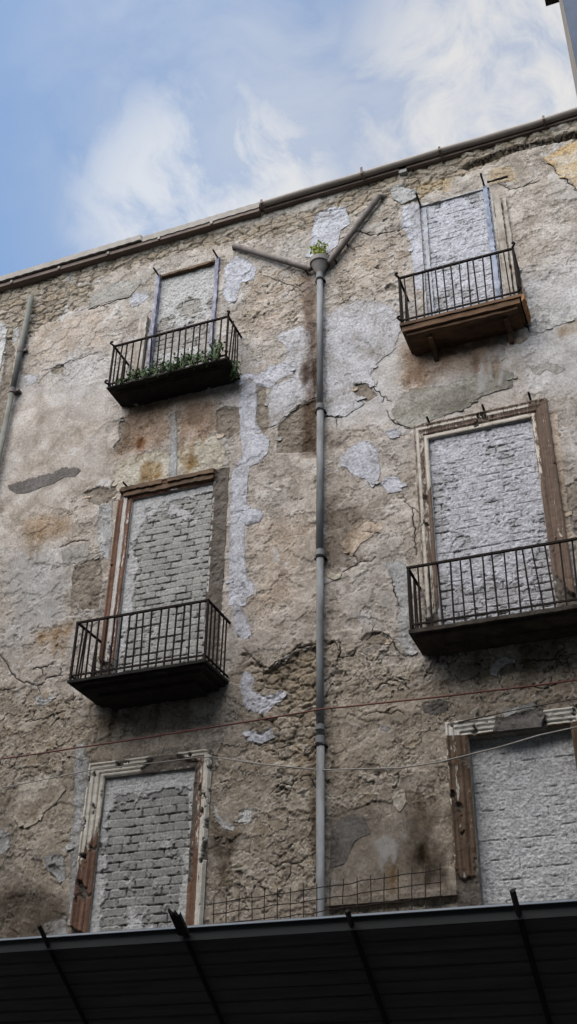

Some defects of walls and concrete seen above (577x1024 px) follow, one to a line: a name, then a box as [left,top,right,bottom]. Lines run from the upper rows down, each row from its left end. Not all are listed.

peeling [543,141,577,189]
peeling [305,206,351,258]
peeling [223,255,257,304]
peeling [340,440,408,493]
crack [0,655,65,722]
spalling [239,648,316,744]
crack [247,625,410,715]